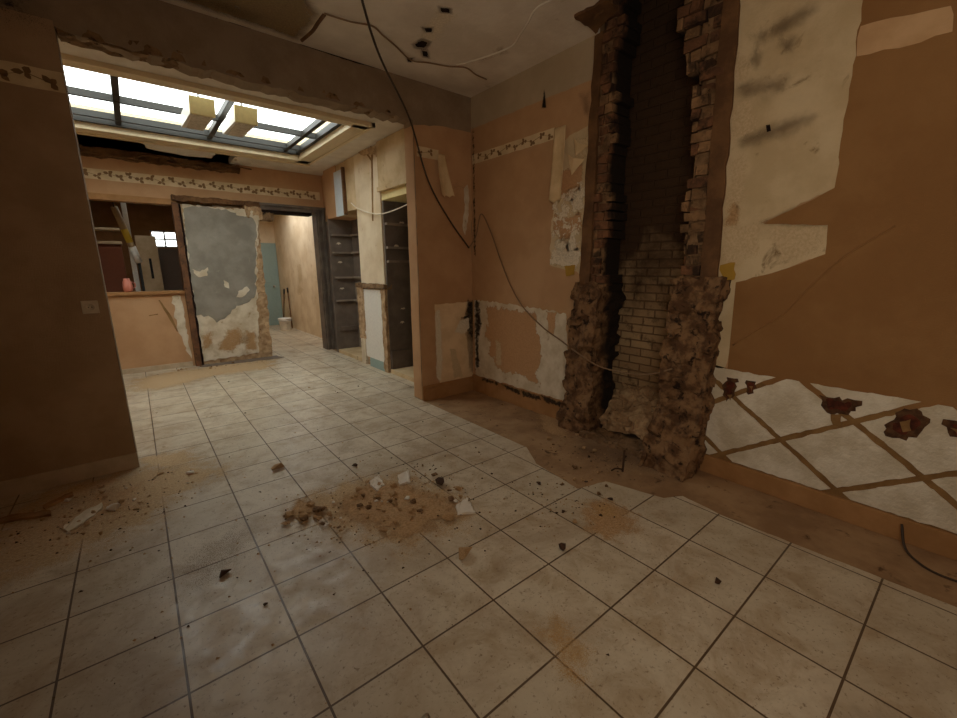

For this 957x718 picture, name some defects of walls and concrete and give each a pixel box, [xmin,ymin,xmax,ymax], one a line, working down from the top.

flaking render [574,0,618,34]
flaking render [55,27,186,69]
peeling [234,208,275,222]
peeling [224,281,250,297]
flaking render [435,132,626,437]
flaking render [638,0,957,535]